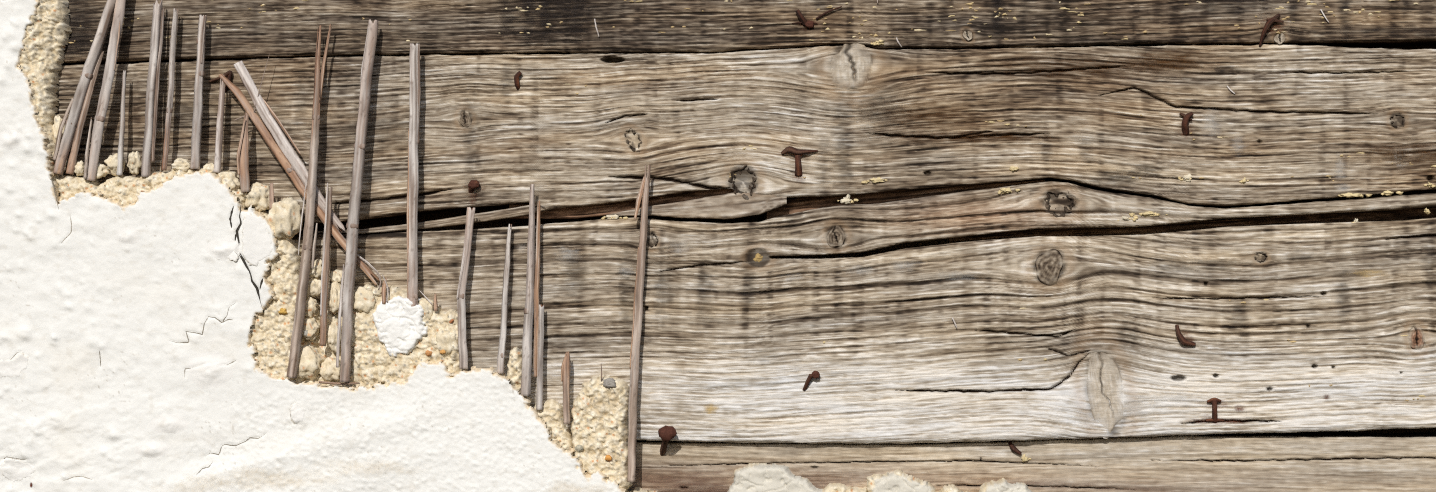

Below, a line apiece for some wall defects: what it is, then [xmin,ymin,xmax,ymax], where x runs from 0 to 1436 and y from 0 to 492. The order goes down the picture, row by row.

spalling [18,0,467,387]
crack [176,206,263,374]
spalling [506,347,522,394]
spalling [534,375,658,492]